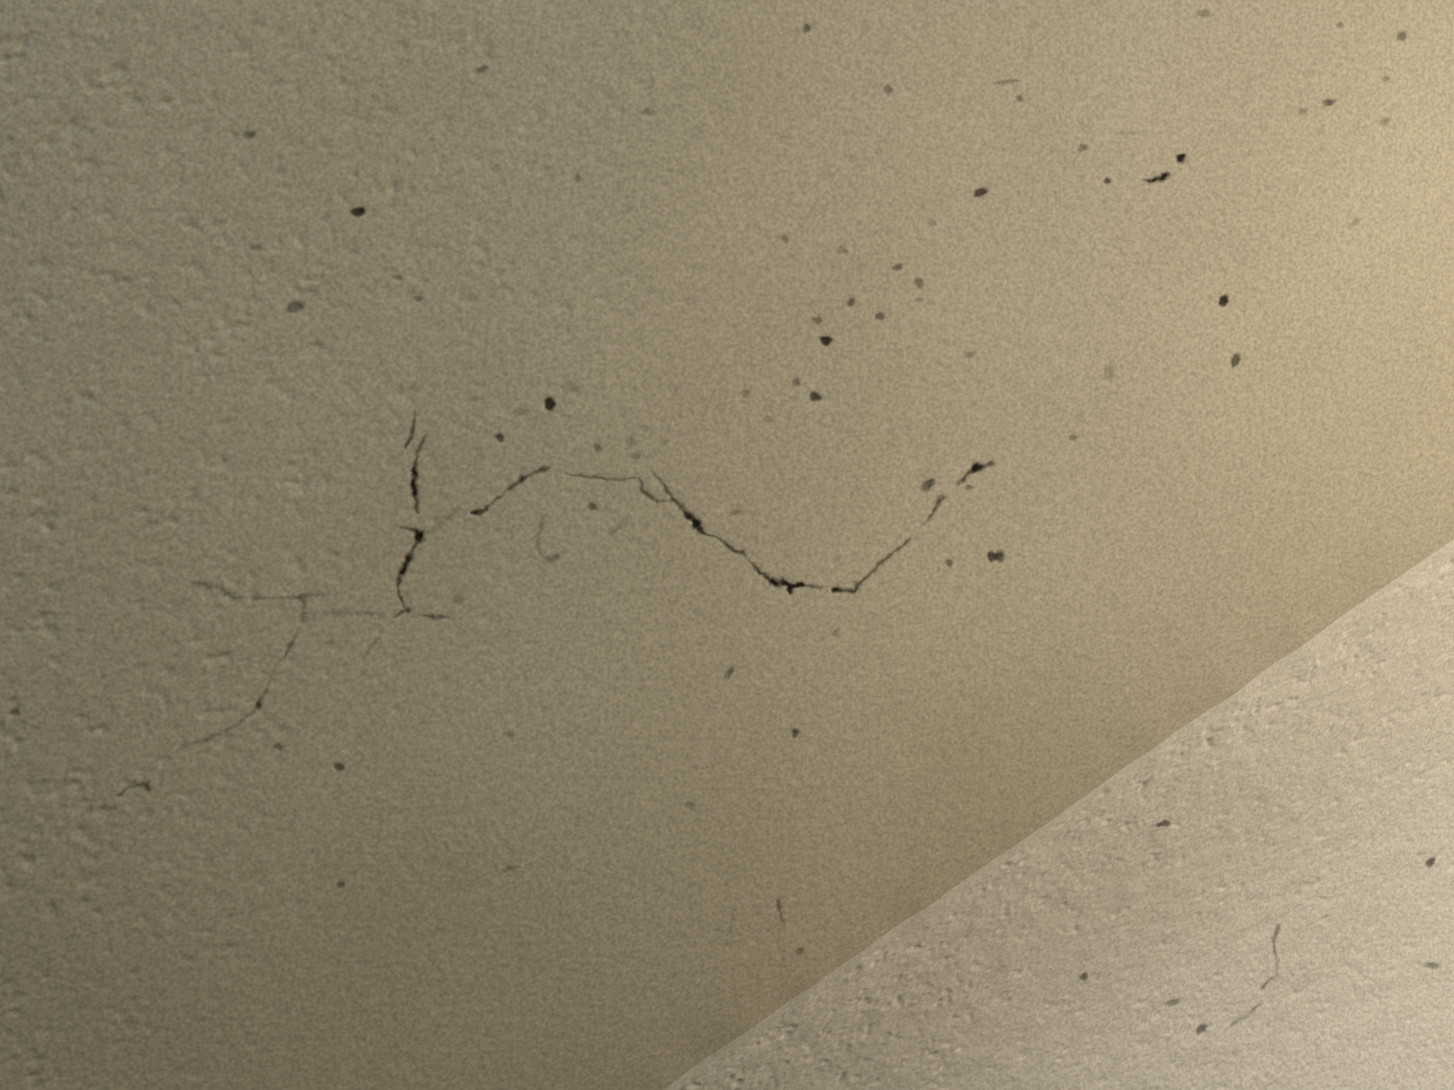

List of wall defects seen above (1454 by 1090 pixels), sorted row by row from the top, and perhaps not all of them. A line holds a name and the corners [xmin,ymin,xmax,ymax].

crack [398,426,434,617]
crack [471,468,543,514]
crack [648,489,864,594]
crack [934,462,992,510]